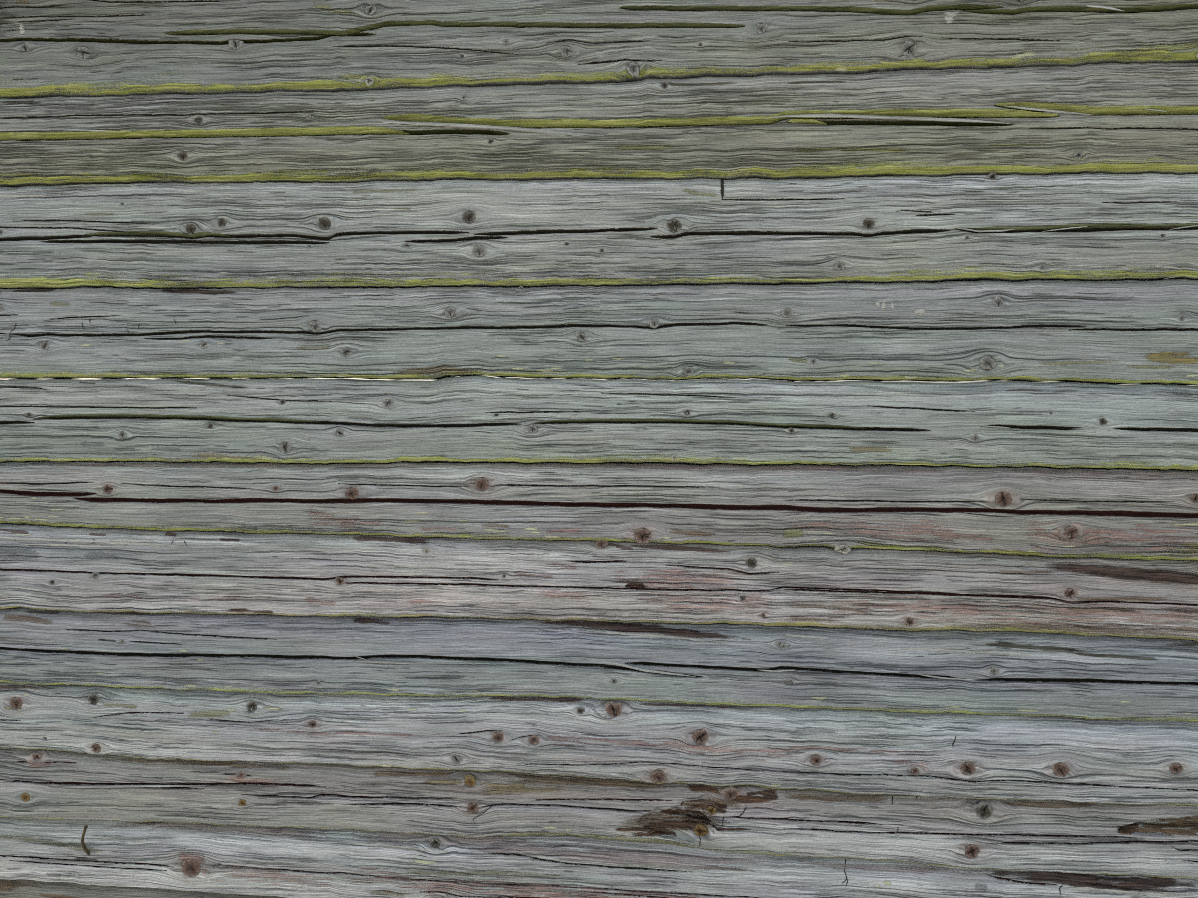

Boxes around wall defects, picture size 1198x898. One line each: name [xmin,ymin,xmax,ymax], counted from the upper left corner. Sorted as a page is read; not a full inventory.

crack [0,0,662,65]
crack [729,5,1060,43]
crack [1069,7,1175,15]
damp [790,61,868,84]
crack [0,111,541,141]
crack [595,105,1198,130]
damp [12,289,69,305]
crack [0,482,1198,518]
crack [0,629,1198,685]
peeling [616,790,778,837]
peeling [1126,828,1198,836]